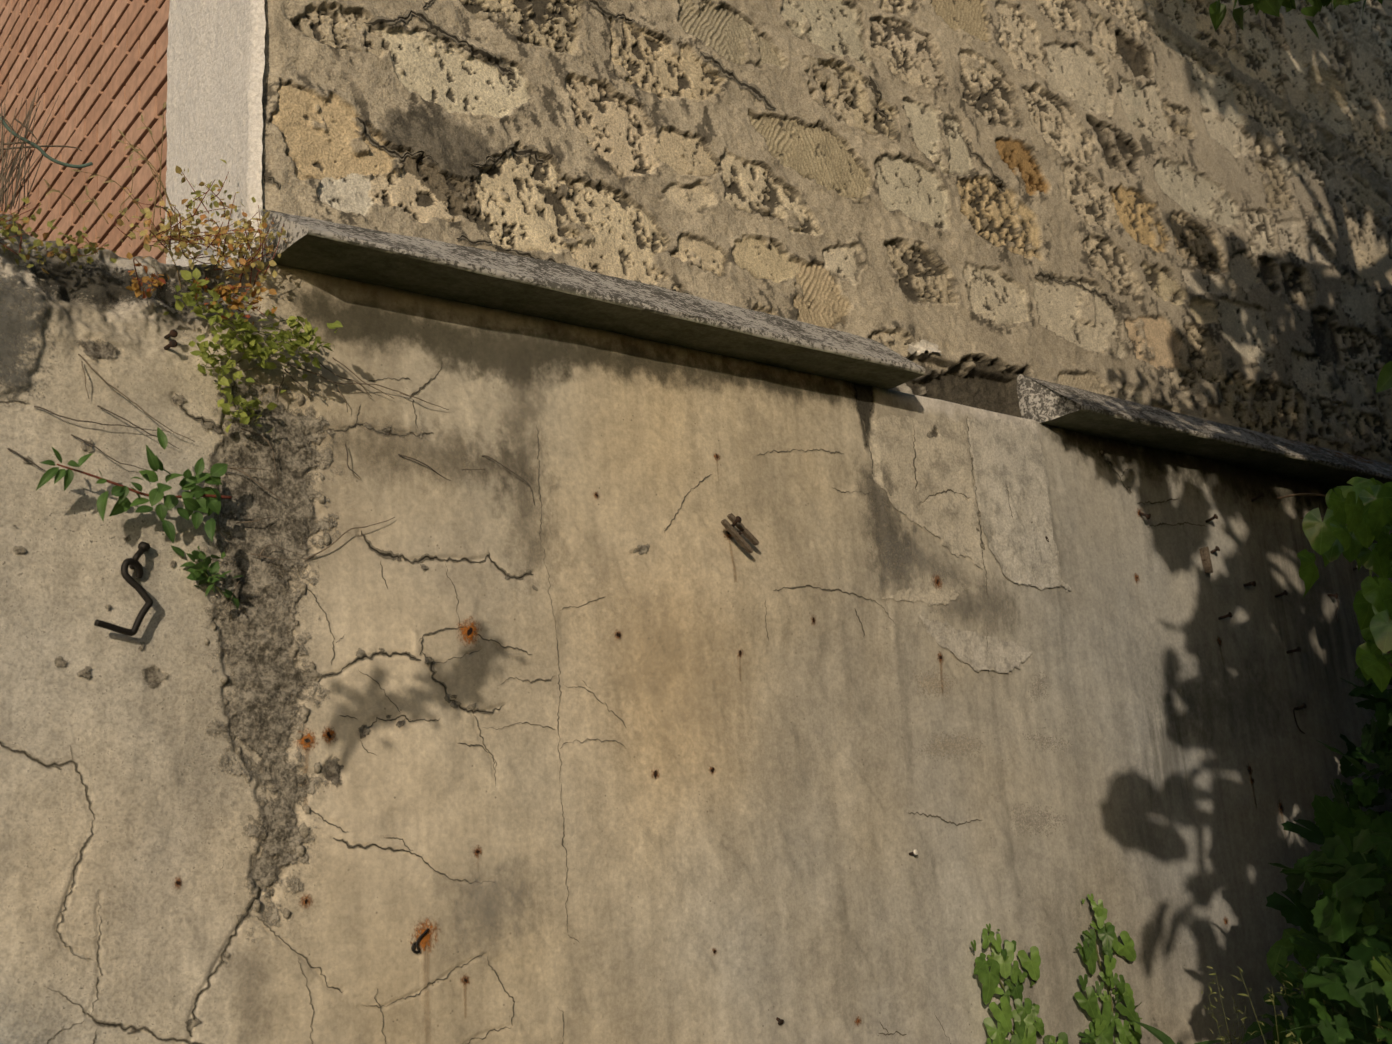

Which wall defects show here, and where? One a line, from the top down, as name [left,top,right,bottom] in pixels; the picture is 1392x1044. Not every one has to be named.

leakage [300,292,874,447]
flaking render [868,415,1072,592]
leakage [1049,425,1337,508]
flaking render [200,370,344,943]
corrosion [297,728,335,750]
crack [302,425,626,943]
corrosion [459,619,479,644]
flaking render [882,574,1032,673]
crack [0,741,515,1044]
corrosion [410,918,437,953]